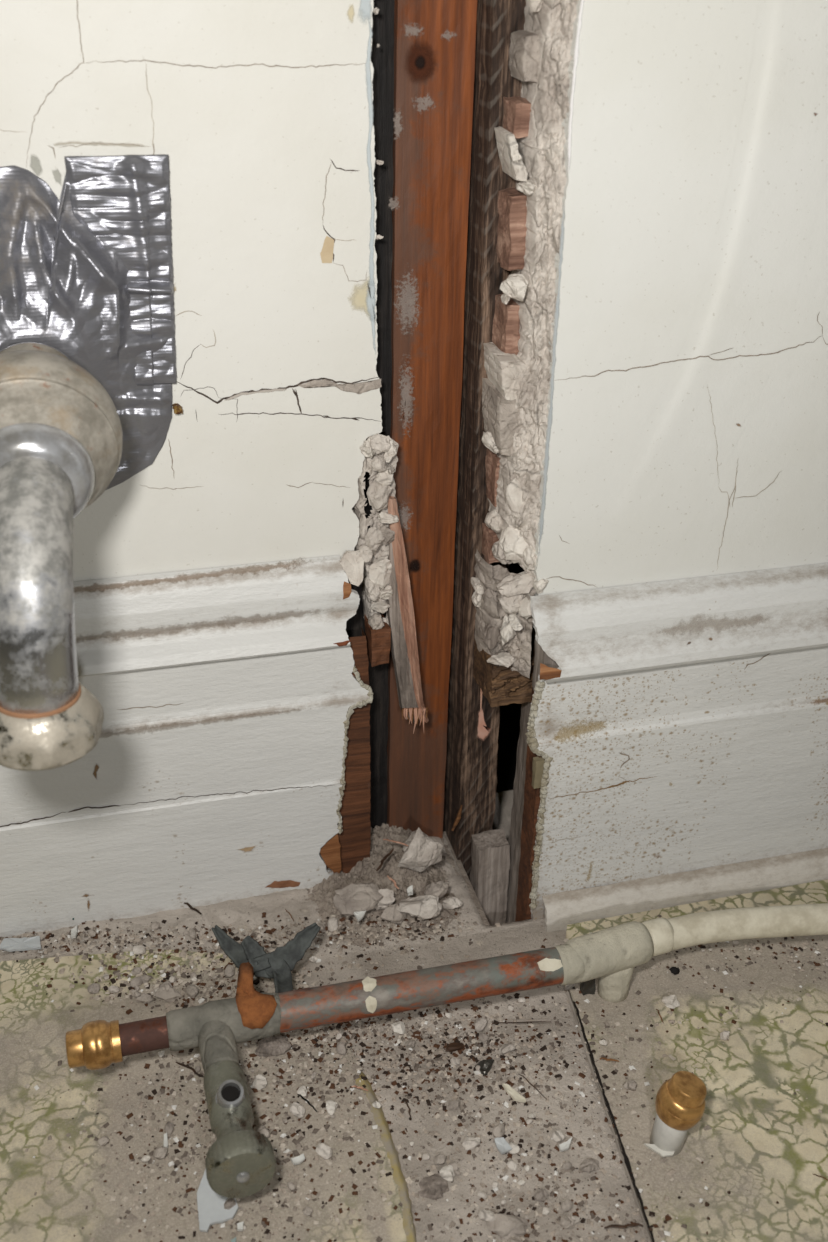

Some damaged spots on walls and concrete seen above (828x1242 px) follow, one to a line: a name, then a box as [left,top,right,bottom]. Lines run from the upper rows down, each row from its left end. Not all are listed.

crack [0,0,366,166]
peeling [320,0,376,349]
crack [139,439,203,490]
crack [176,311,382,422]
flaking render [339,434,399,630]
flaking render [474,0,584,680]
crack [554,314,827,569]
crack [0,785,330,827]
peeling [320,834,341,873]